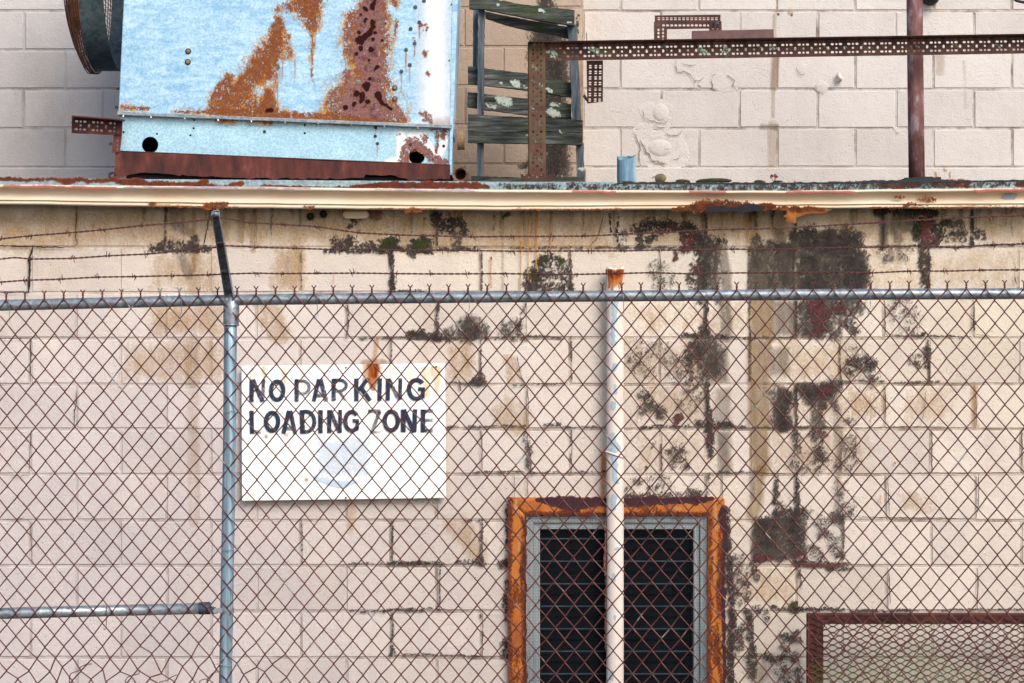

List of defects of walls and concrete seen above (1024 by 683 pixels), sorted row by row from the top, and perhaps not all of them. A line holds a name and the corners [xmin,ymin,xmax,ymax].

corrosion [672,197,826,228]
leakage [1,207,1014,683]
corrosion [506,496,608,683]
corrosion [625,505,723,683]